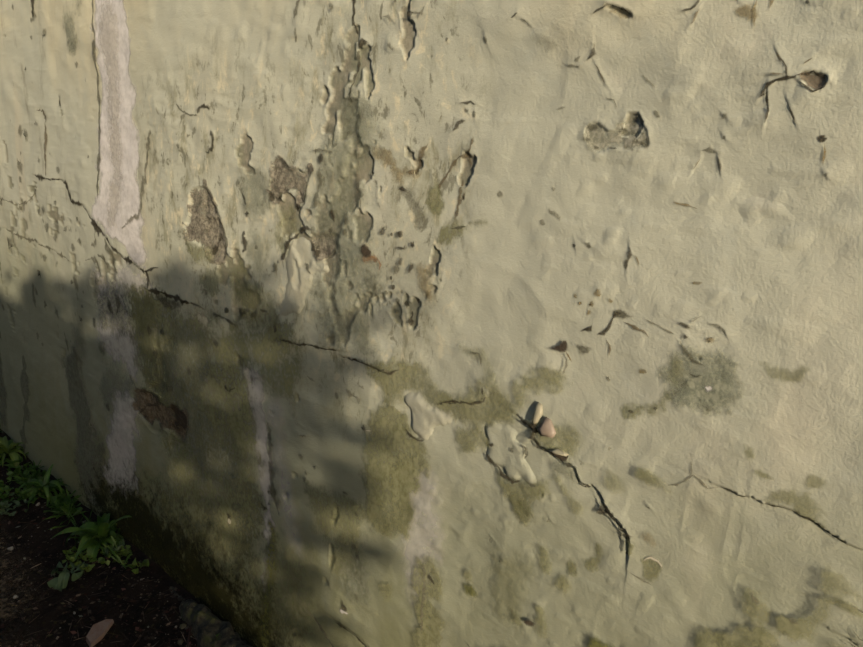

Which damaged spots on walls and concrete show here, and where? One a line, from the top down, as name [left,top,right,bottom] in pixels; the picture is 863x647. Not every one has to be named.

crack [348,0,367,102]
peeling [761,52,827,121]
crack [0,109,235,326]
spalling [182,179,226,265]
spalling [266,148,331,219]
peeling [274,210,348,317]
crack [552,310,672,373]
damp [66,348,138,507]
damp [101,261,301,562]
damp [362,359,565,537]
crack [521,420,634,555]
damp [412,559,445,647]